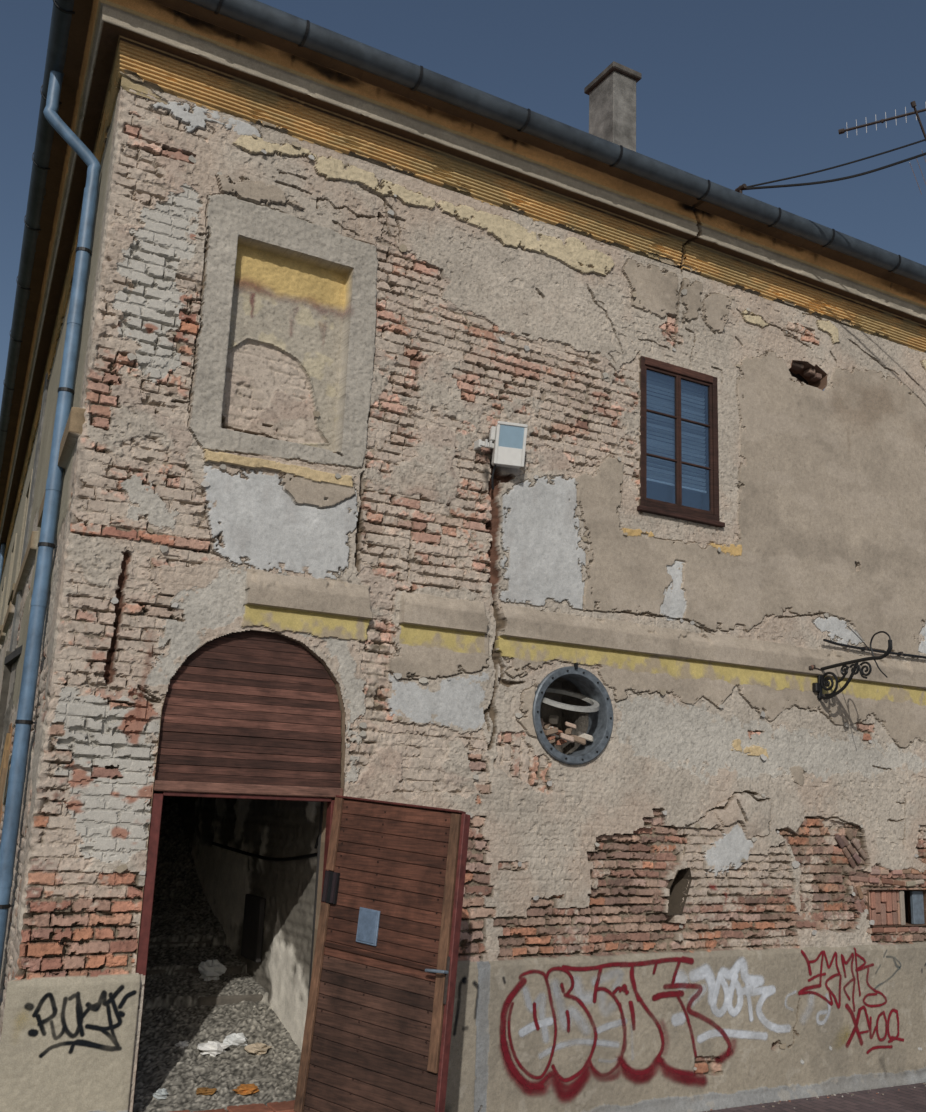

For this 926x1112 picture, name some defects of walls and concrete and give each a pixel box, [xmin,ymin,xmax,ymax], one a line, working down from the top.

spalling [85,345,139,431]
flaking render [221,338,329,444]
flaking render [153,101,684,355]
spalling [442,325,613,438]
crack [587,200,724,385]
crack [735,308,920,386]
flaking render [70,464,359,579]
flaking render [500,351,926,655]
spalling [59,593,186,652]
crack [103,550,162,704]
crack [483,455,526,751]
spalling [242,603,926,961]